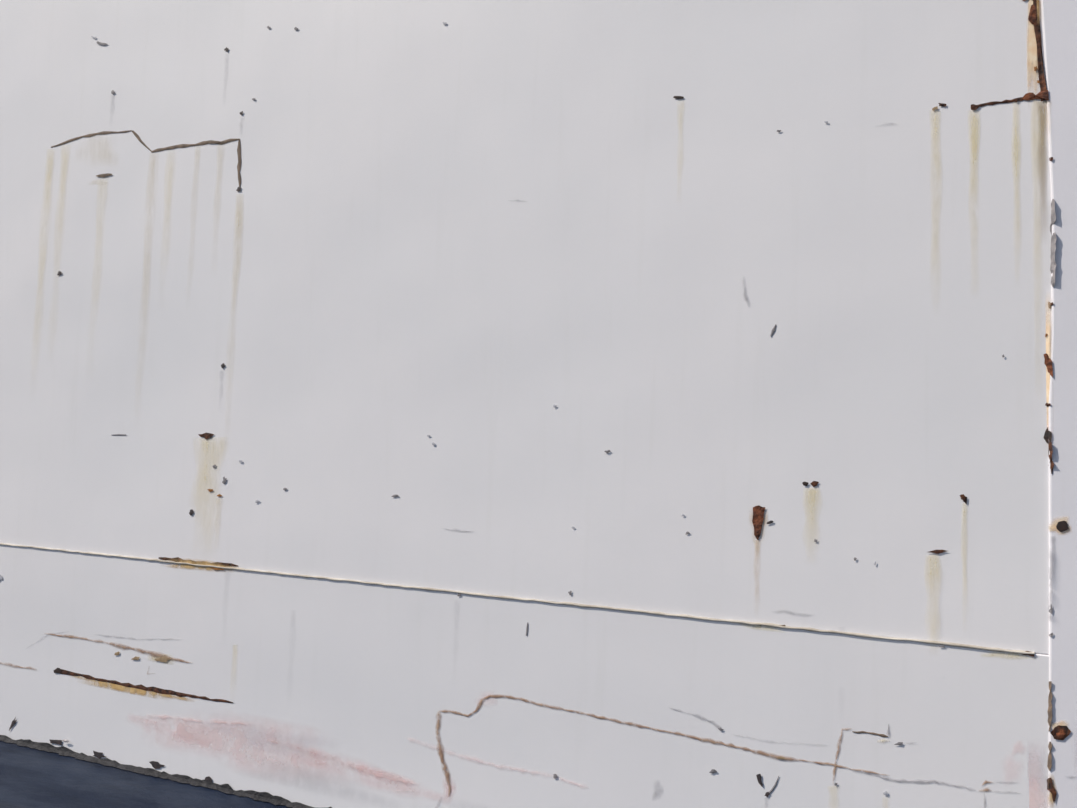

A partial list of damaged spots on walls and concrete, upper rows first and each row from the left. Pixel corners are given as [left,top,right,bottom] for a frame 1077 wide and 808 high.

rust [971,0,1053,161]
crack [52,130,241,191]
rust [1043,322,1054,474]
rust [158,557,238,570]
rust [752,505,765,540]
peeling [0,717,315,808]
crack [436,695,959,794]
rust [1047,681,1071,802]